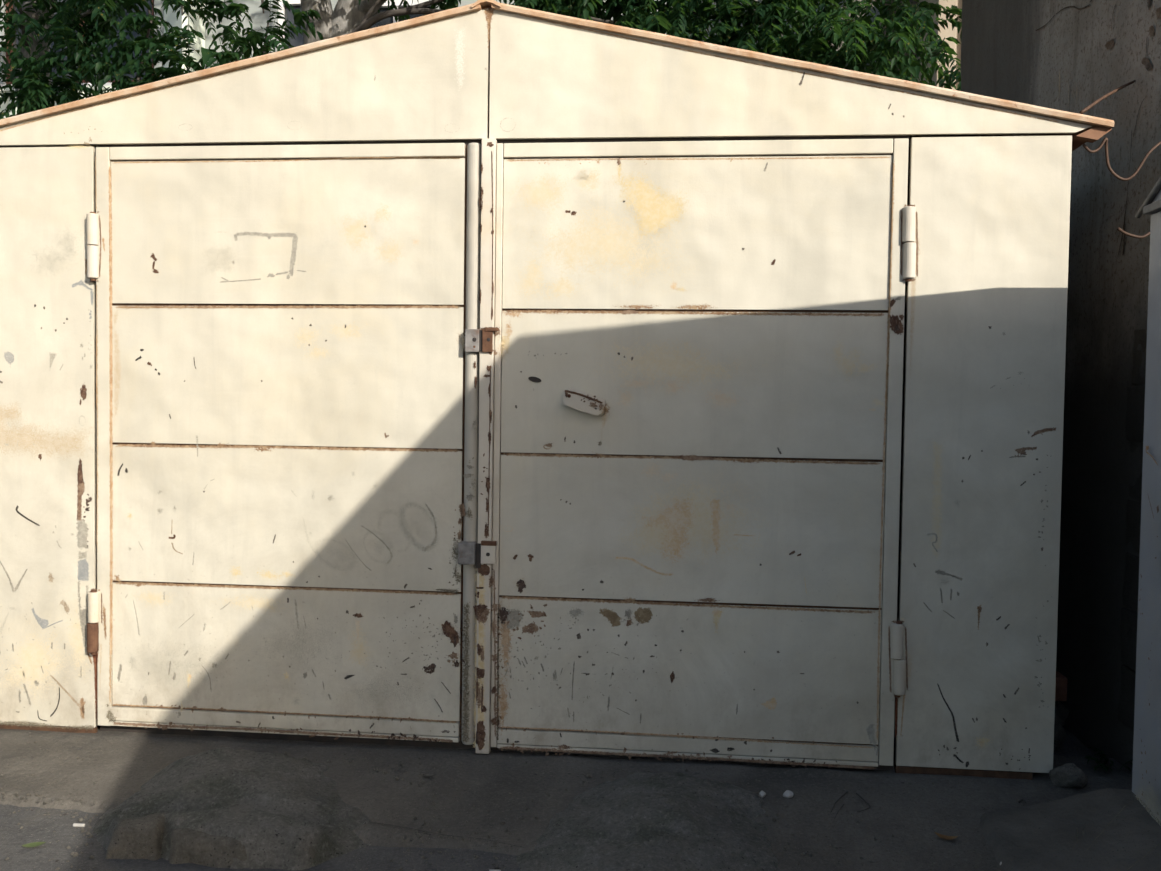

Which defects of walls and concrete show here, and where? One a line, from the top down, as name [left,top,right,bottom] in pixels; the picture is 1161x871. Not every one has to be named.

rust [455,142,921,751]
rust [453,504,465,579]
peeling [496,604,595,658]
peeling [599,607,657,646]